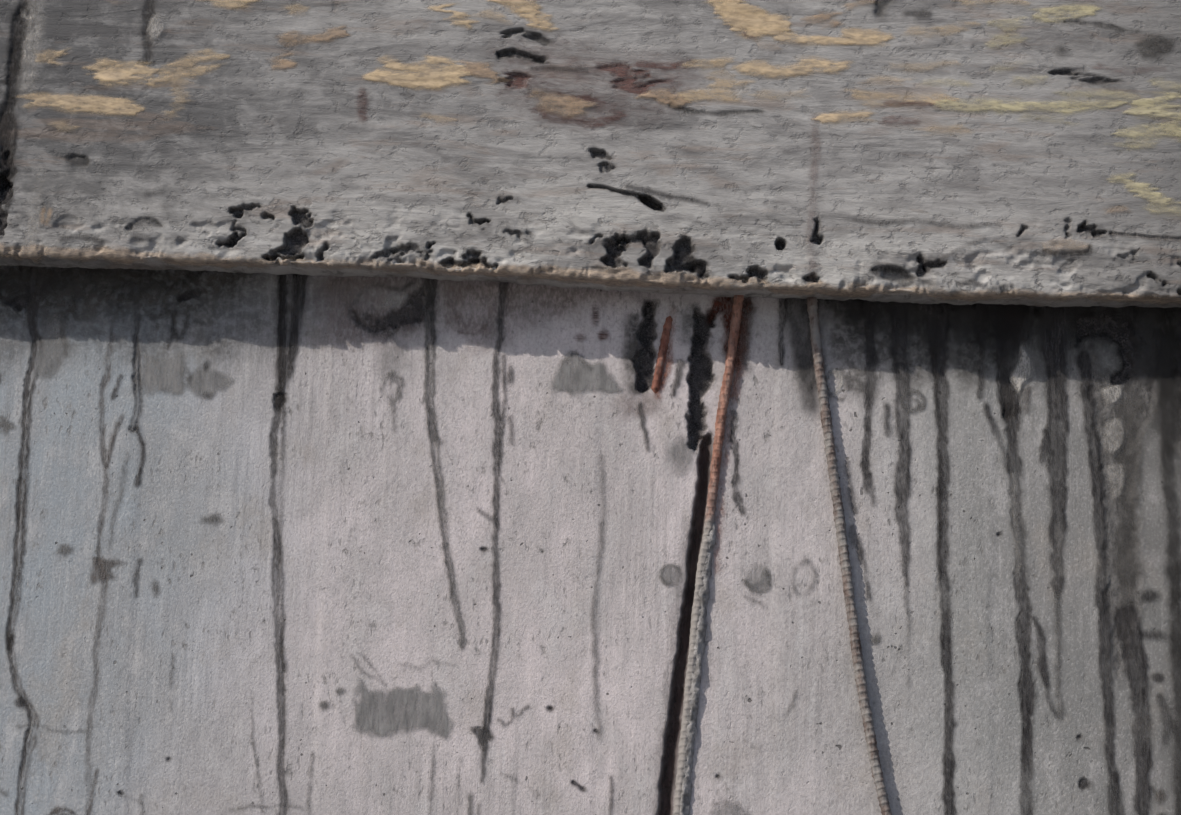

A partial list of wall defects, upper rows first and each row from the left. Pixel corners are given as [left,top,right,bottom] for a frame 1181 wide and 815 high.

crack [0,3,28,178]
crack [0,266,44,815]
corrosion [708,297,753,395]
crack [730,416,745,514]
spalling [806,297,892,815]
damp [778,298,1181,815]